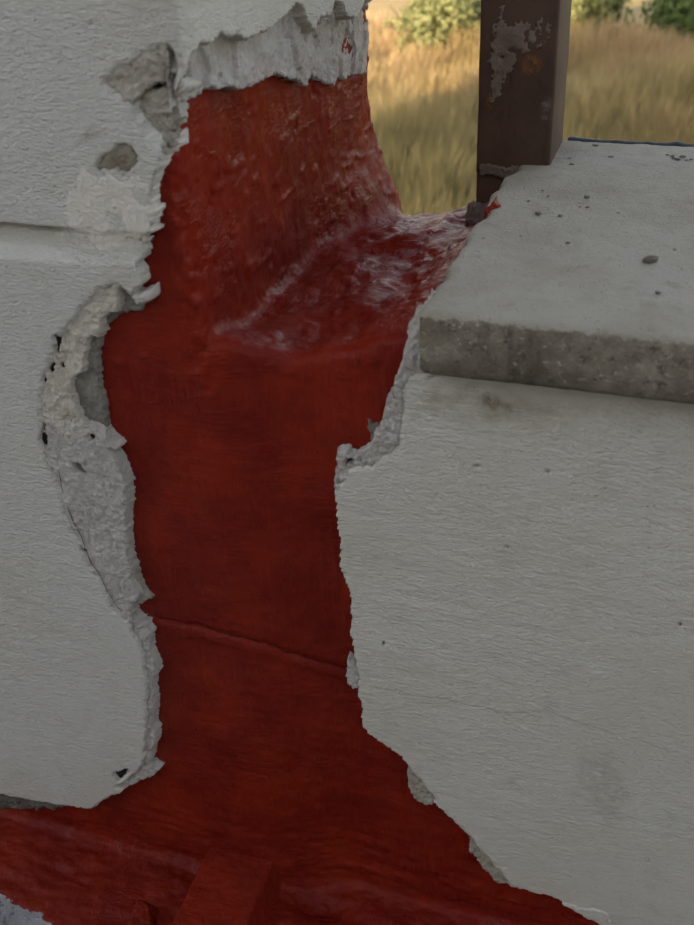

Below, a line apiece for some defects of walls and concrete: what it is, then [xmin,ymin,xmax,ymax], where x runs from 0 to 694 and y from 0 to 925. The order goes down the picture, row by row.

peeling [487,5,552,104]
peeling [105,3,370,155]
spalling [98,144,138,175]
peeling [484,195,501,219]
spalling [334,286,436,490]
spalling [41,284,165,789]
flaking render [345,651,359,689]
spalling [407,765,435,805]
spalling [469,836,509,884]